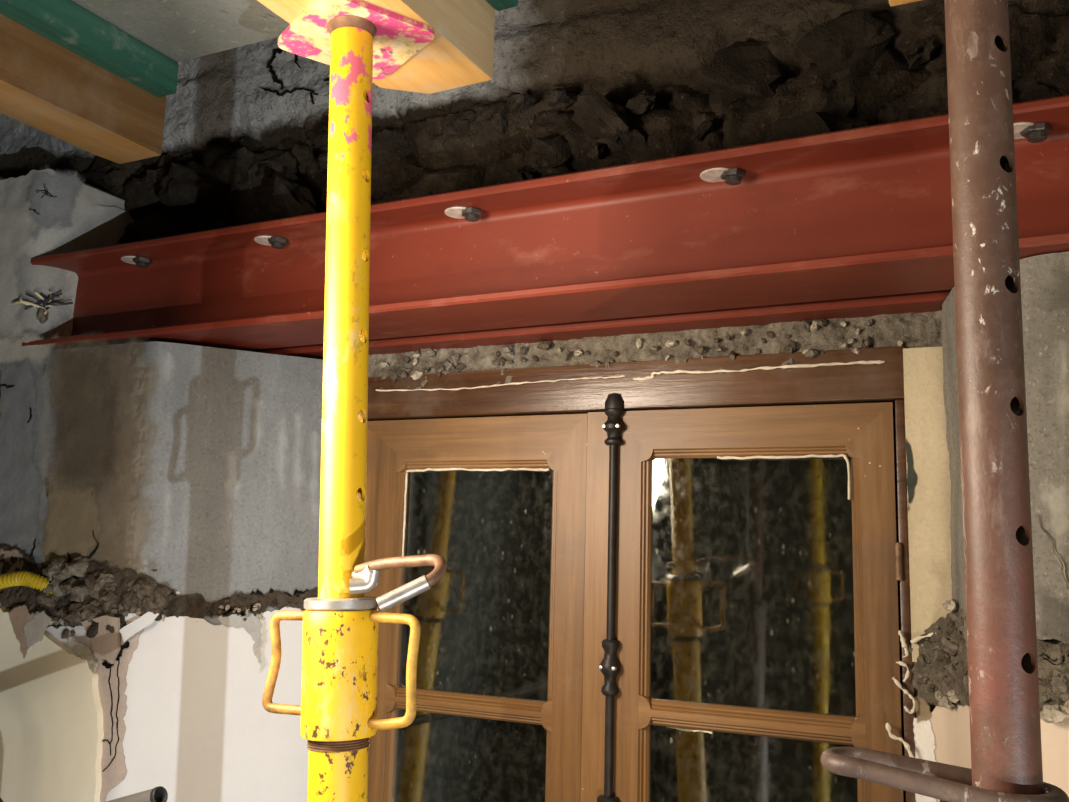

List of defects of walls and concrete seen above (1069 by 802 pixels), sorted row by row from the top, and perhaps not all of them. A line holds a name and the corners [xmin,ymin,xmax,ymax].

crack [260,48,330,105]
spalling [0,333,318,802]
crack [102,655,120,772]
spalling [885,599,969,762]
spalling [1037,640,1069,724]
peeling [915,793,936,802]